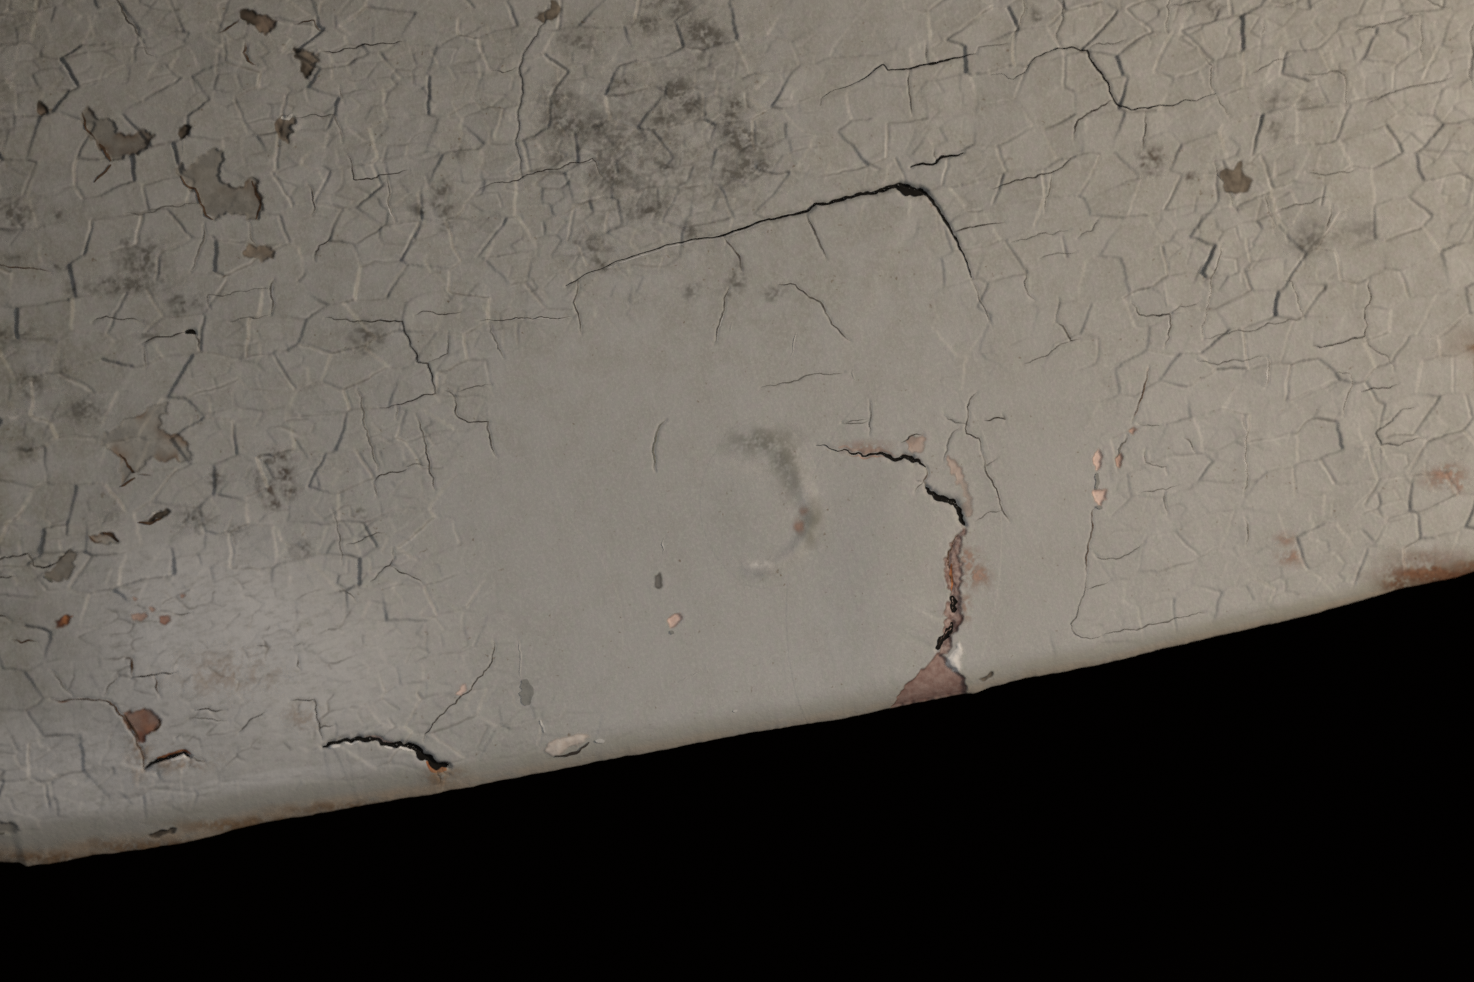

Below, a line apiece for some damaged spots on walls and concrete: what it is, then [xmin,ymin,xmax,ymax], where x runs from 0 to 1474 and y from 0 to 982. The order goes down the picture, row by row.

leakage [693,23,722,45]
peeling [81,107,153,182]
peeling [176,149,263,220]
leakage [726,101,766,177]
crack [329,0,1227,510]
peeling [102,402,191,487]
crack [819,395,1007,650]
peeling [892,456,993,707]
crack [1071,511,1202,639]
peeling [124,709,161,743]
crack [56,659,262,769]
crack [296,647,495,780]